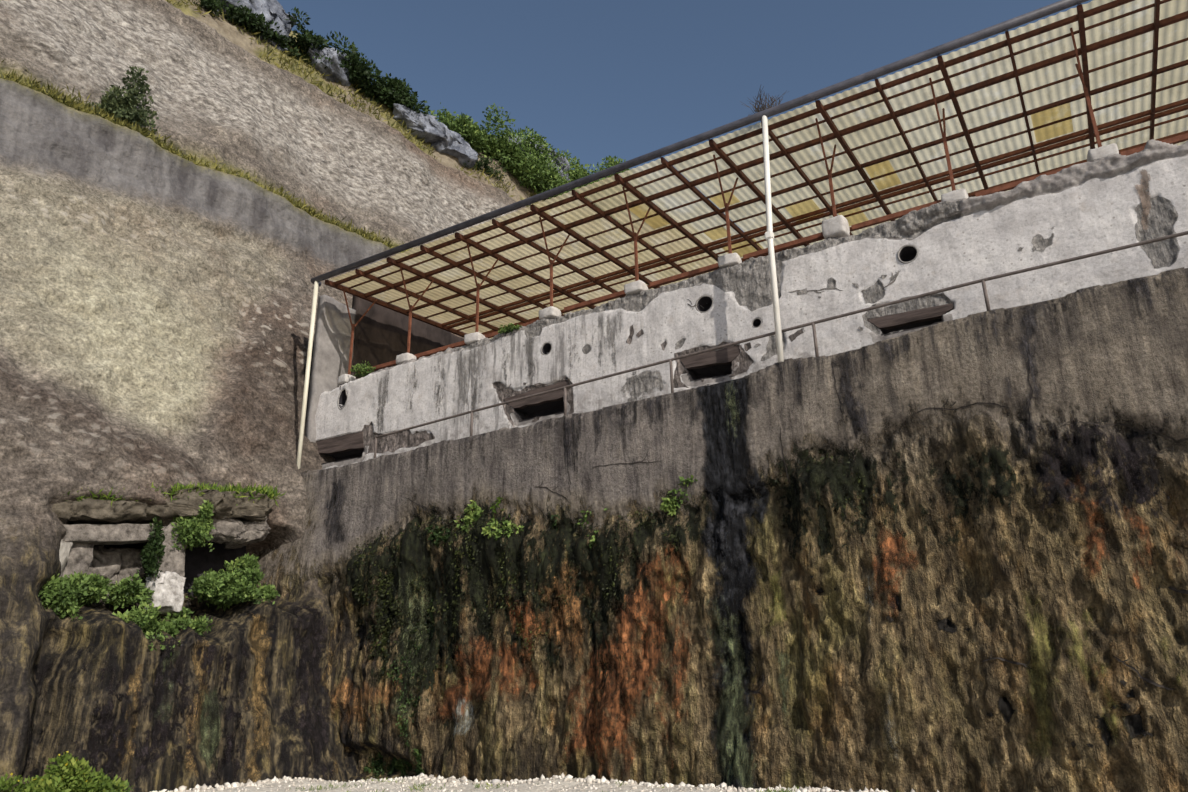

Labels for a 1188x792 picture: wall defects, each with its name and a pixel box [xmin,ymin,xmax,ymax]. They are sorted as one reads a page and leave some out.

spalling [454,200,963,351]
spalling [1019,227,1054,252]
spalling [1135,183,1180,269]
leakage [374,373,389,425]
spalling [362,422,435,454]
leakage [436,345,486,421]
spalling [622,328,804,402]
leakage [324,480,346,544]
leakage [594,304,1174,791]
rust [872,530,918,614]
rust [428,545,697,780]
leakage [574,580,633,687]